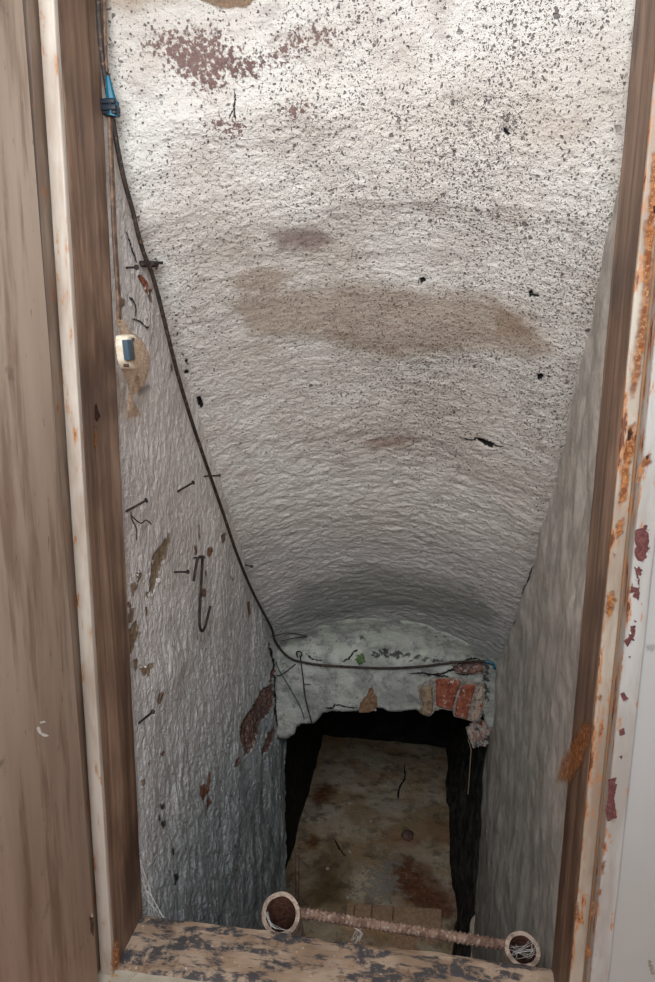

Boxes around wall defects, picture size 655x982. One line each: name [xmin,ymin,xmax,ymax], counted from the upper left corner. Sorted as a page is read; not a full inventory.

peeling [134,0,337,103]
peeling [202,114,253,142]
peeling [279,98,315,123]
water stain [280,231,327,247]
rust [631,153,655,393]
rust [619,425,651,503]
flaking render [127,533,170,678]
flaking render [235,664,276,767]
flaking render [418,663,486,723]
water stain [309,849,417,907]
rust [390,859,456,918]